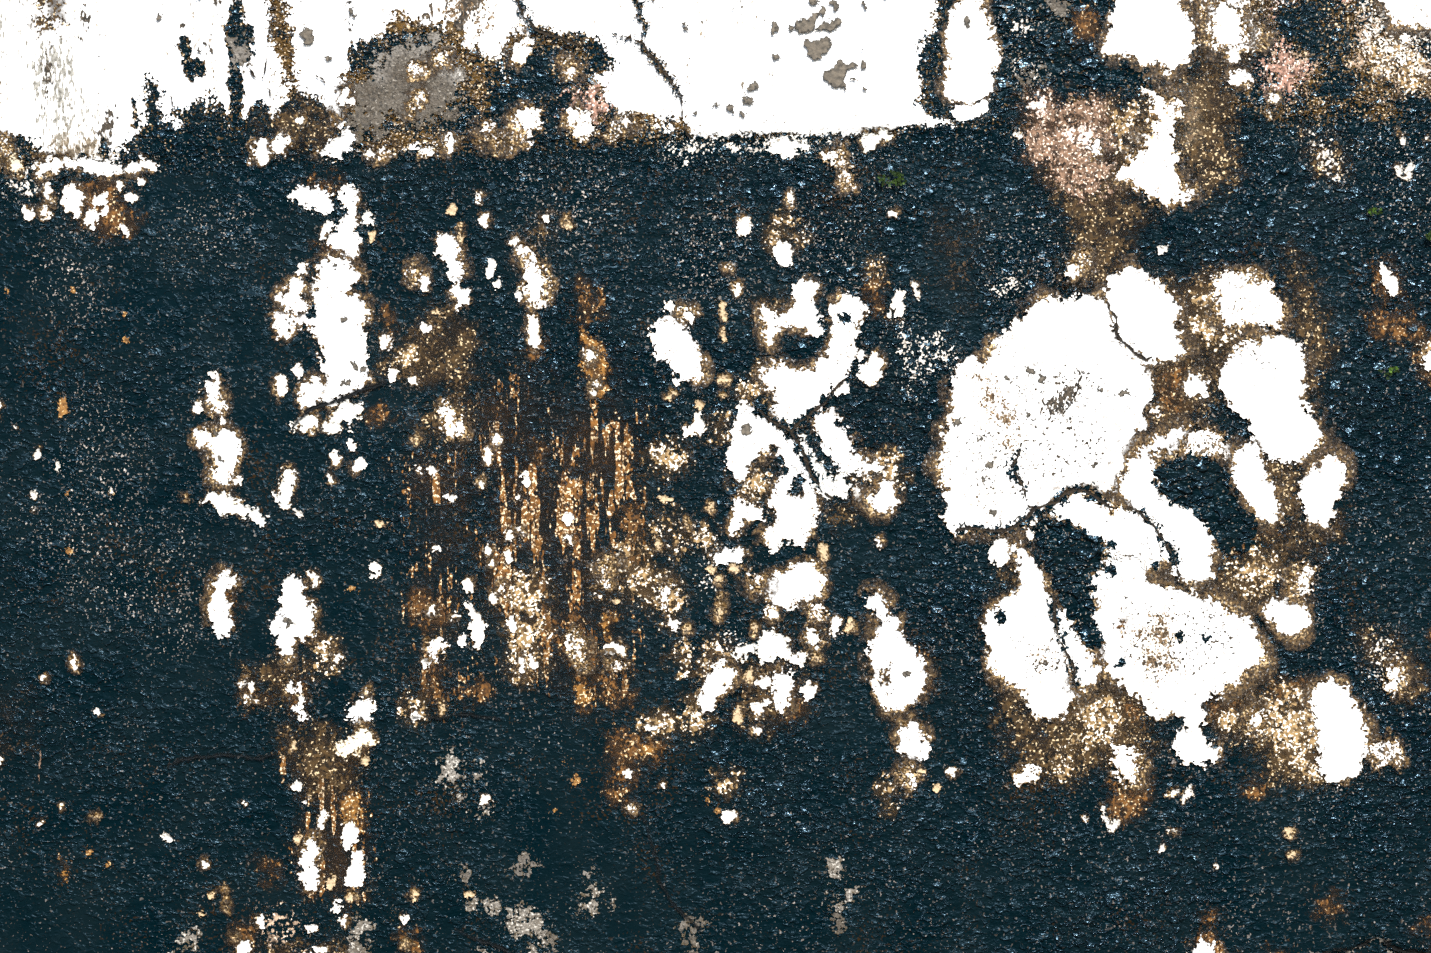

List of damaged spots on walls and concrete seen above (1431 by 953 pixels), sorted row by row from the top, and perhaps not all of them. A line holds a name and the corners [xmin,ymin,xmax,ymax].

leakage [0,0,358,199]
leakage [344,0,362,73]
crack [514,0,690,137]
leakage [421,0,1431,169]
peeling [0,130,160,242]
spalling [245,6,644,487]
crack [1106,301,1152,361]
peeling [180,371,304,528]
peeling [586,186,1418,825]
crack [954,442,1183,576]
crack [1046,585,1086,691]
peeling [167,561,424,953]